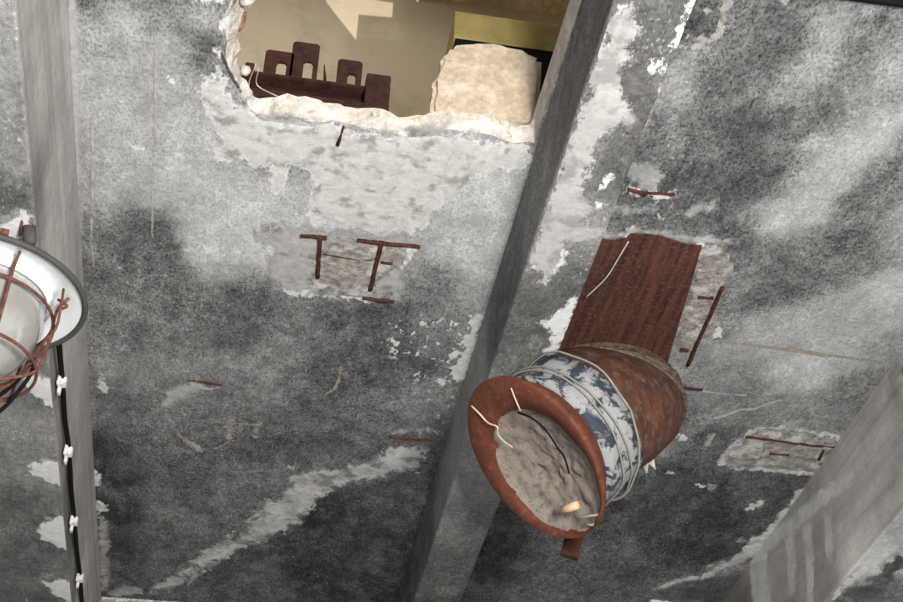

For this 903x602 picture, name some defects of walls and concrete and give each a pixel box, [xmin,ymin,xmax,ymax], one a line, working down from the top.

water stain [69,0,80,196]
flaking render [192,0,581,304]
flaking render [527,0,738,367]
water stain [613,162,677,221]
water stain [685,201,715,217]
spalling [717,425,840,476]
water stain [97,516,175,602]